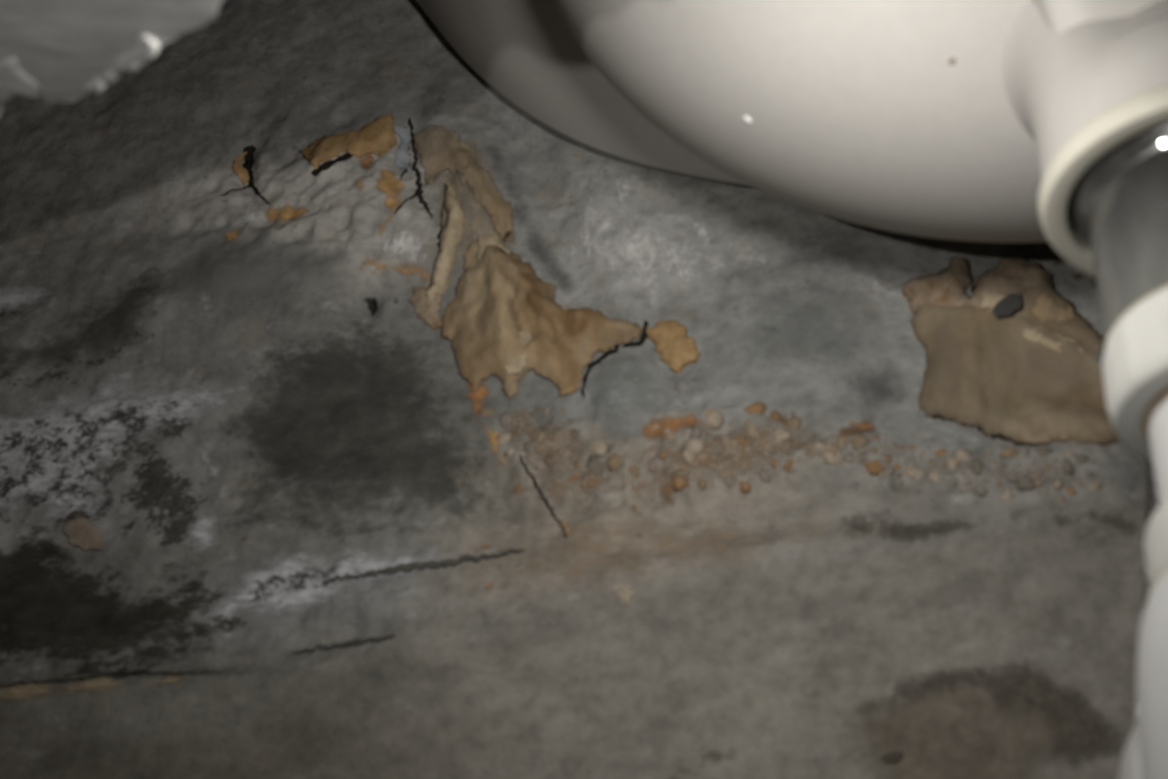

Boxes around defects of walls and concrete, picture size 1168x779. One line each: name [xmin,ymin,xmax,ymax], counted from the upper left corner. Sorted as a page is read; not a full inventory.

crack [221,145,270,204]
crack [395,118,444,252]
leakage [244,334,465,500]
crack [580,320,648,399]
peeling [300,114,1121,511]
leakage [0,383,526,678]
crack [520,455,568,537]
leakage [869,668,1116,779]